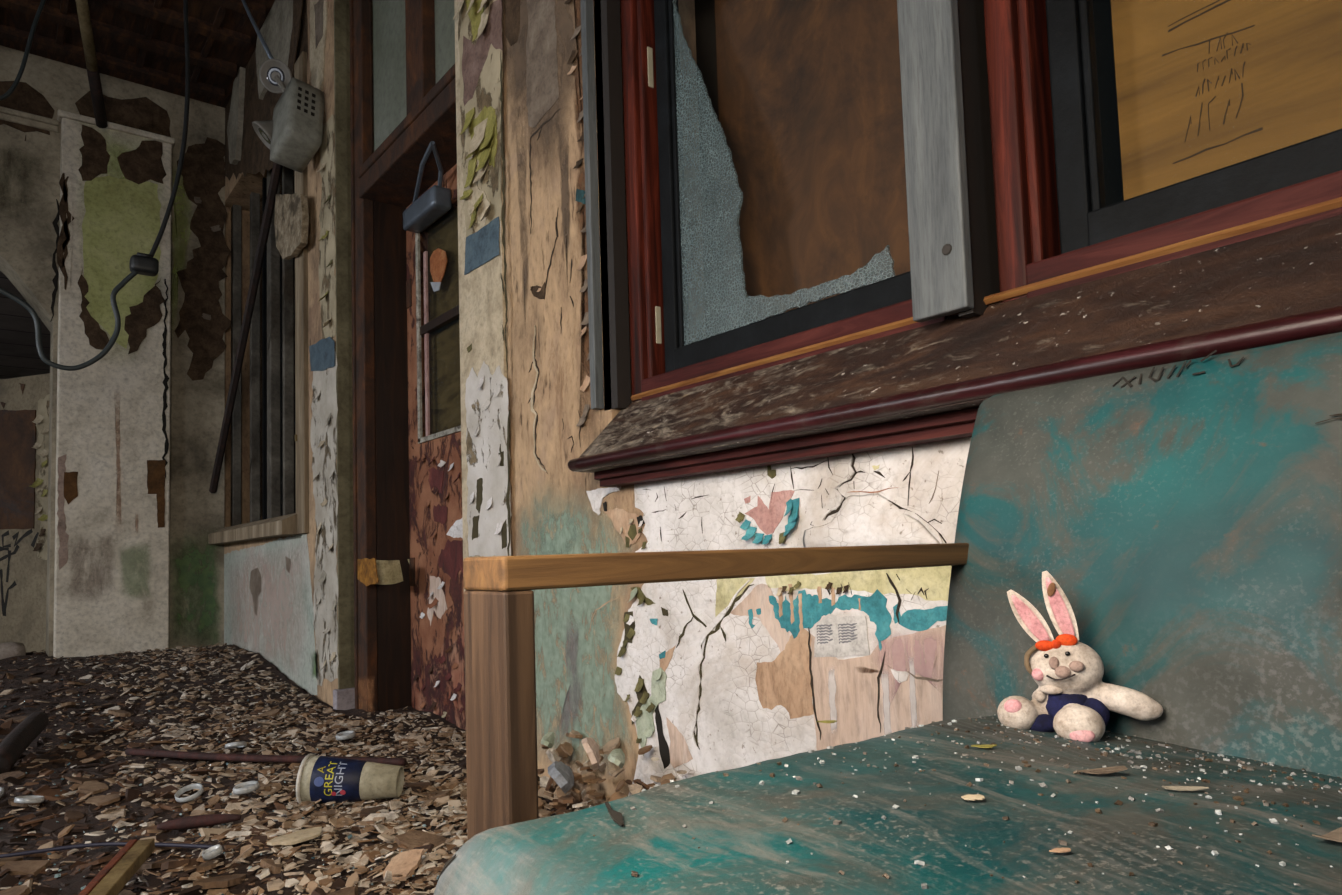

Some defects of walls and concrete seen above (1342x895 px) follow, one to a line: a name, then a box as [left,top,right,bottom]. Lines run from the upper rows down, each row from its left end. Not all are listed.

crack [50,173,75,322]
peeling [78,0,328,381]
peeling [30,115,468,895]
peeling [415,343,511,626]
crack [643,488,707,541]
peeling [586,437,972,552]
crack [770,447,947,544]
crack [886,573,929,623]
crack [588,579,754,769]
peeling [615,566,952,796]
crack [808,627,821,740]
crack [877,652,943,733]